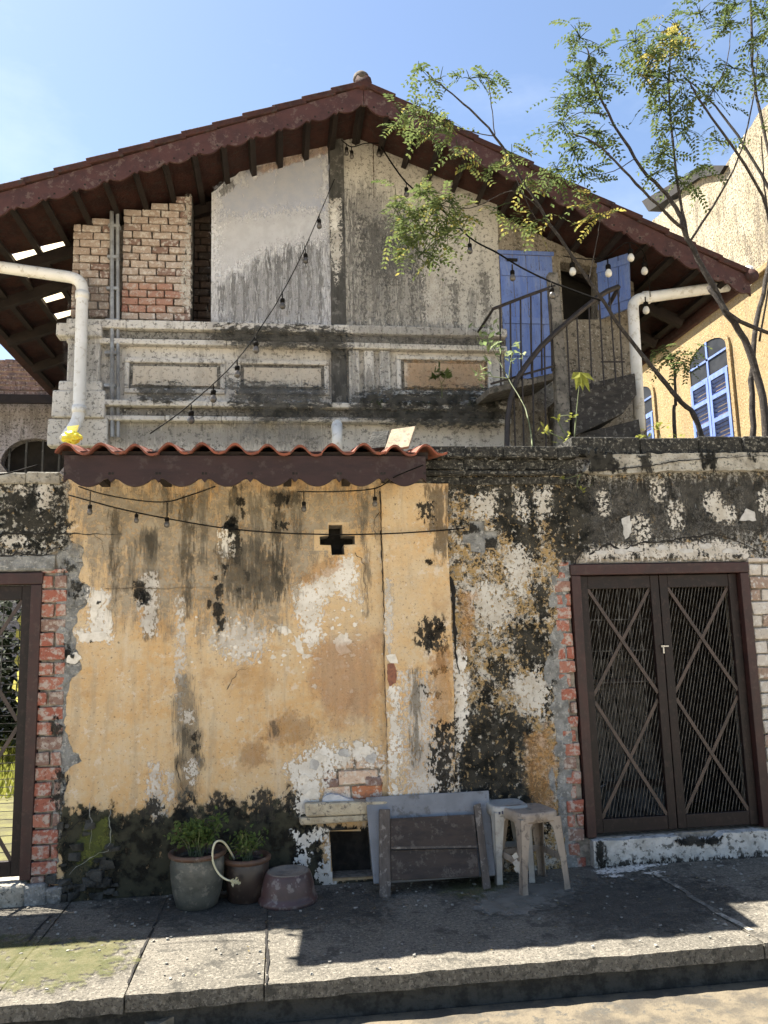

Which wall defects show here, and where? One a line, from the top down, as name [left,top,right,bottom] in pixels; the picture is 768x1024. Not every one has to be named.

leakage [212,198,343,285]
leakage [134,380,197,404]
leakage [224,376,333,423]
flaking render [30,537,121,903]
leakage [0,479,380,902]
peeling [195,554,368,689]
peeling [282,740,387,816]
leakage [387,449,768,804]
spalling [543,477,768,868]
peeling [292,827,337,885]